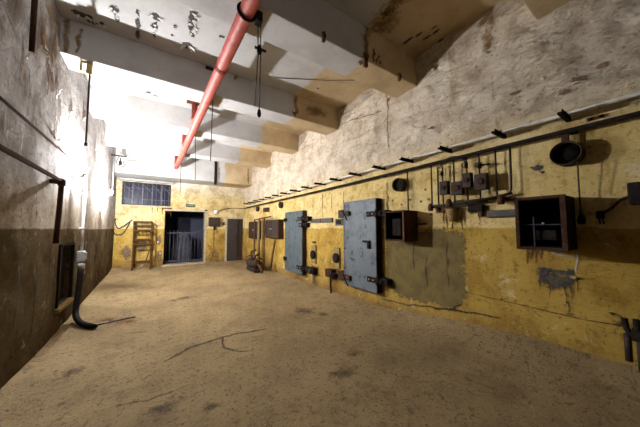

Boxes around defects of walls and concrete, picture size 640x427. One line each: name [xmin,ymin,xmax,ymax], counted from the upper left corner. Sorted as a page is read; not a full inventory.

peeling [71,9,107,28]
peeling [148,12,163,38]
peeling [180,11,199,53]
leakage [359,0,402,65]
crack [383,292,621,326]
crack [163,329,265,362]